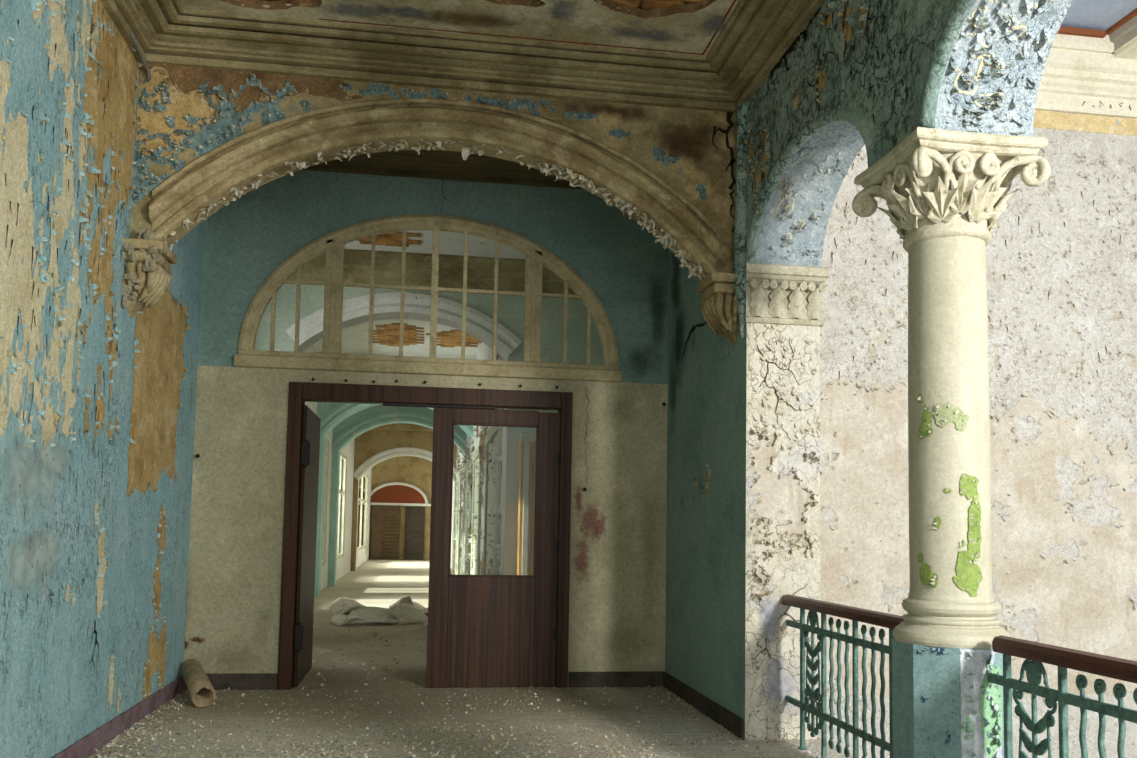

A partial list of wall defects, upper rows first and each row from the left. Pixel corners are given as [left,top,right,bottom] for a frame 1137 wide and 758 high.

peeling [0,0,833,758]
crack [681,322,707,374]
crack [757,337,813,440]
crack [712,0,907,233]
peeling [744,115,969,708]
crack [831,202,898,264]
peeling [945,0,1060,136]
peeling [945,149,1137,661]